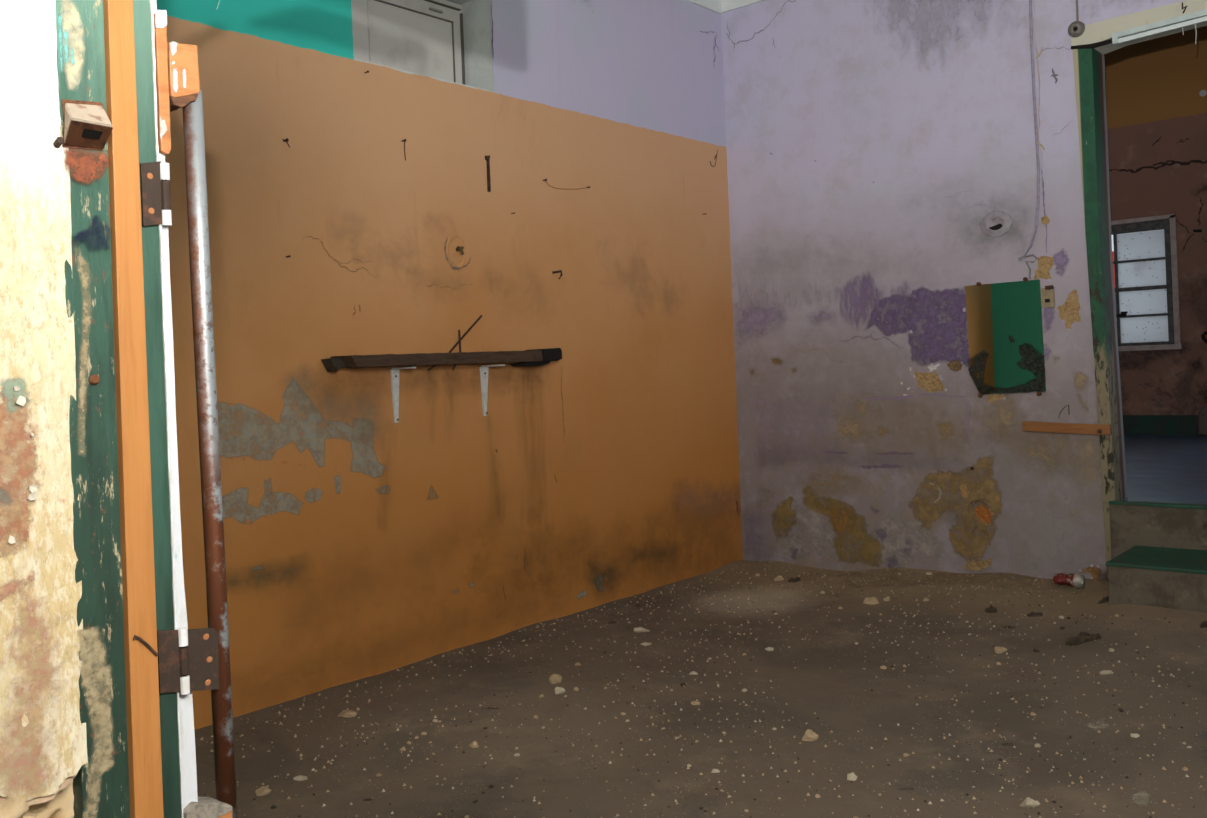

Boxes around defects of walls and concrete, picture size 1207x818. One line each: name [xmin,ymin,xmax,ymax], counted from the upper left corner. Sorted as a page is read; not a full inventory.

peeling [62,4,84,88]
crack [700,0,796,67]
crack [1109,136,1207,173]
peeling [839,275,969,396]
peeling [0,379,38,557]
peeling [217,379,390,524]
peeling [0,602,77,818]